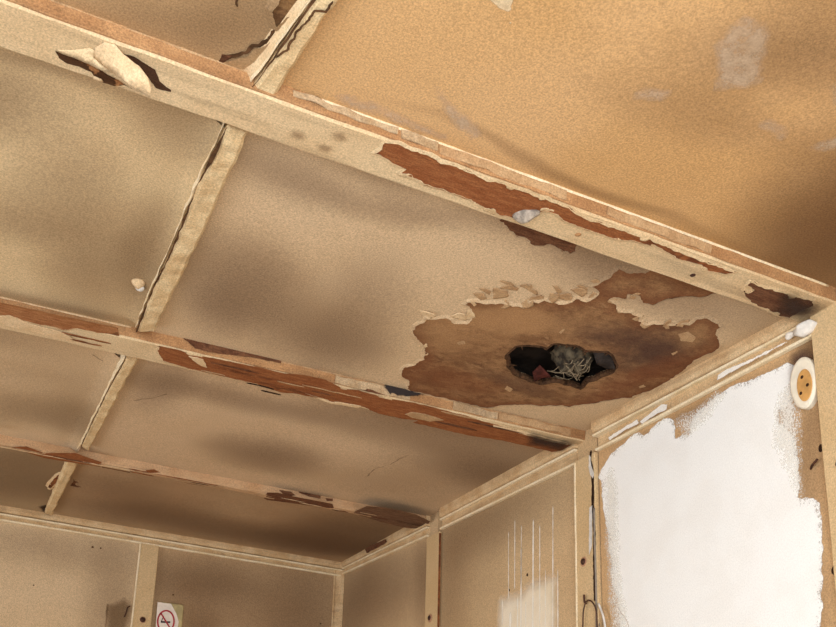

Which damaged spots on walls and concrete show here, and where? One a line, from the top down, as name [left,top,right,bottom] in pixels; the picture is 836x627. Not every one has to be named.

peeling [265,0,297,31]
peeling [371,139,738,276]
crack [136,128,227,332]
peeling [740,280,817,319]
peeling [155,265,724,452]
peeling [13,446,130,473]
peeling [45,472,60,490]
peeling [264,490,334,509]
peeling [351,506,430,528]